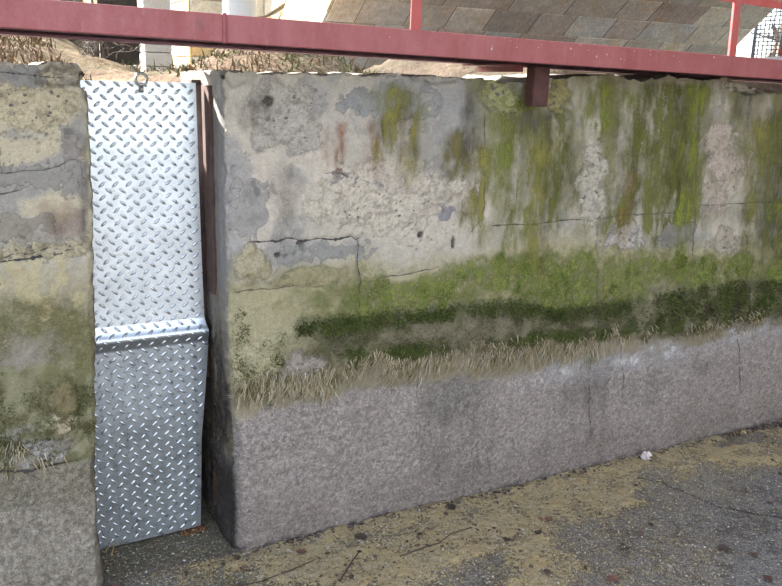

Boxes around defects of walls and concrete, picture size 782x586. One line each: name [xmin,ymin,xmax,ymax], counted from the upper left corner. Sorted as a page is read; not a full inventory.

spalling [244,72,354,156]
crack [0,159,83,195]
damp [494,112,539,255]
spalling [574,145,609,226]
spalling [701,122,754,214]
crack [0,247,74,262]
crack [249,236,361,308]
crack [469,95,770,392]